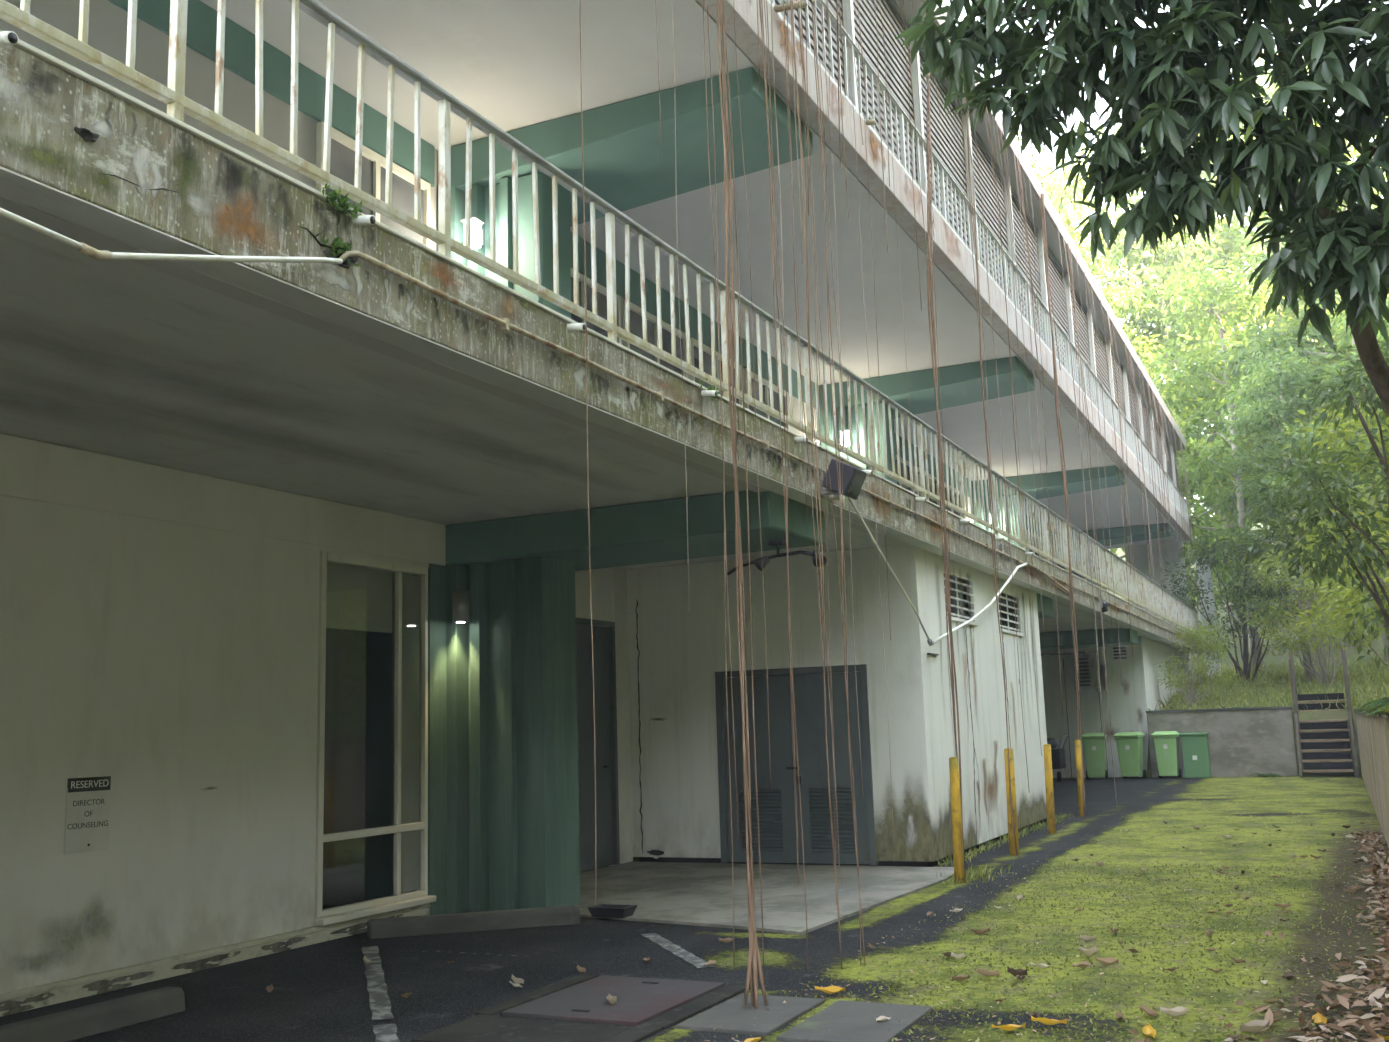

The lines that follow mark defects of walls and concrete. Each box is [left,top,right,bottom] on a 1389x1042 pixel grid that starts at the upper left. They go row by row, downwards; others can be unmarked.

damp [0,62,57,99]
damp [94,104,113,136]
damp [134,147,211,215]
damp [218,155,290,222]
damp [551,352,608,391]
damp [626,388,695,426]
peeling [262,937,308,952]
peeling [74,951,242,994]
peeling [0,993,57,1016]